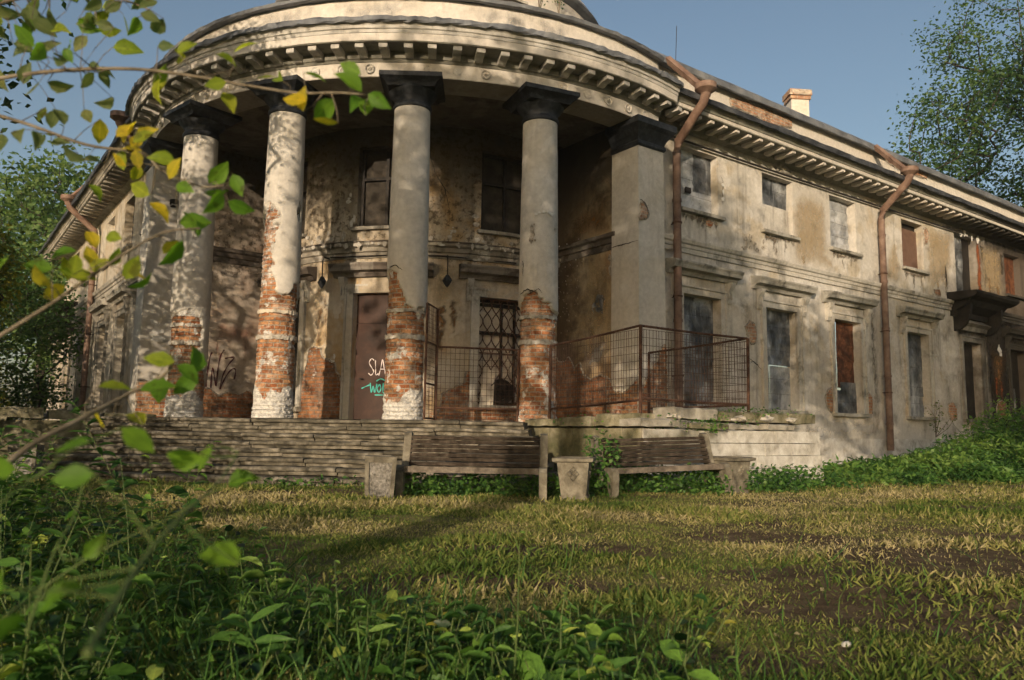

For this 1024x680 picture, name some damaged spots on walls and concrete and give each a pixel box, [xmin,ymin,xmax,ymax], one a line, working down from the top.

spalling [729,98,792,128]
spalling [134,202,341,419]
spalling [382,259,668,429]